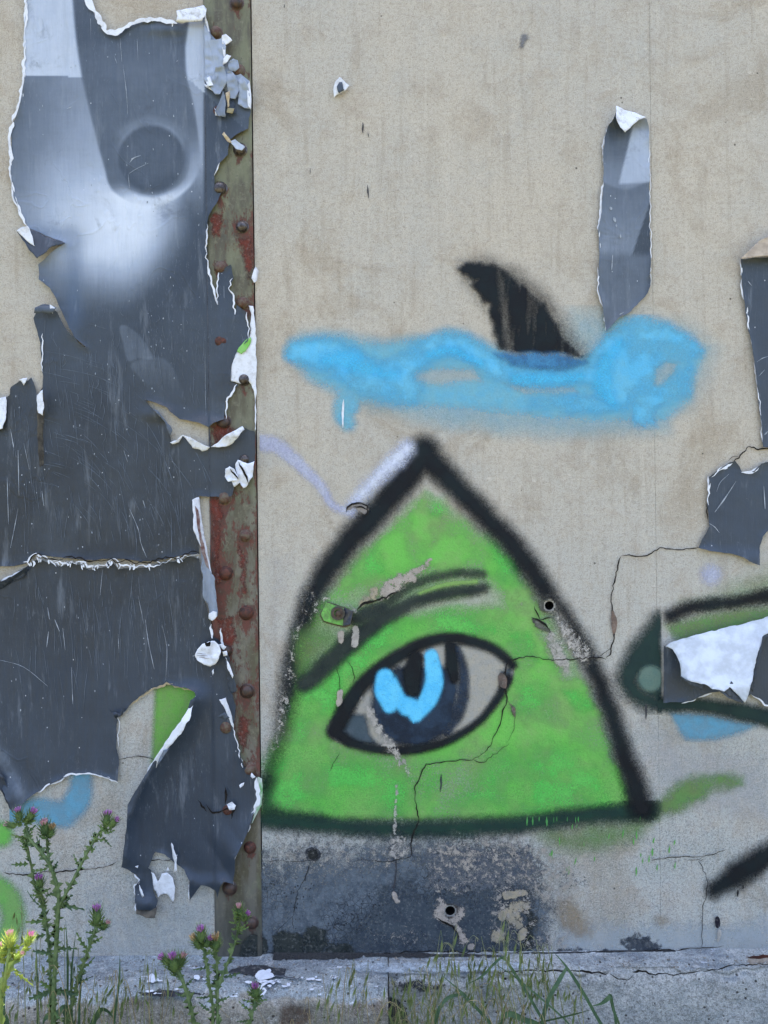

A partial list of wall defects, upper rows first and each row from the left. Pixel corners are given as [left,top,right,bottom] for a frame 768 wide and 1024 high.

corrosion [239,236,254,278]
corrosion [213,425,235,443]
corrosion [210,498,224,585]
peeling [346,558,433,613]
corrosion [216,616,237,651]
crack [354,547,699,862]
corrosion [238,716,252,751]
peeling [355,833,581,974]
crack [384,850,768,980]